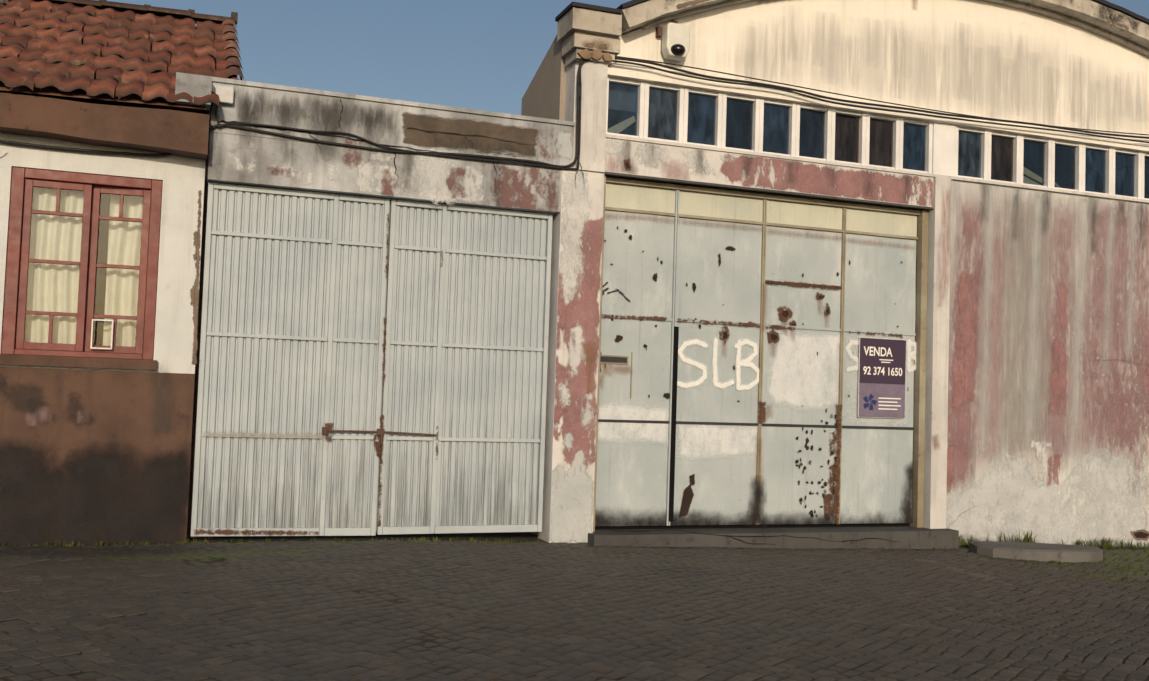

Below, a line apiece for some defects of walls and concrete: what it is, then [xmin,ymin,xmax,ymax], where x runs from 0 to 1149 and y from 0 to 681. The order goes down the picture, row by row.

peeling [233,138,256,172]
peeling [606,139,948,217]
peeling [190,190,202,365]
peeling [328,113,630,543]
corrosion [602,306,797,343]
corrosion [766,280,840,317]
peeling [944,206,1149,548]
damp [0,443,190,546]
corrosion [374,415,384,527]
corrosion [595,401,913,526]